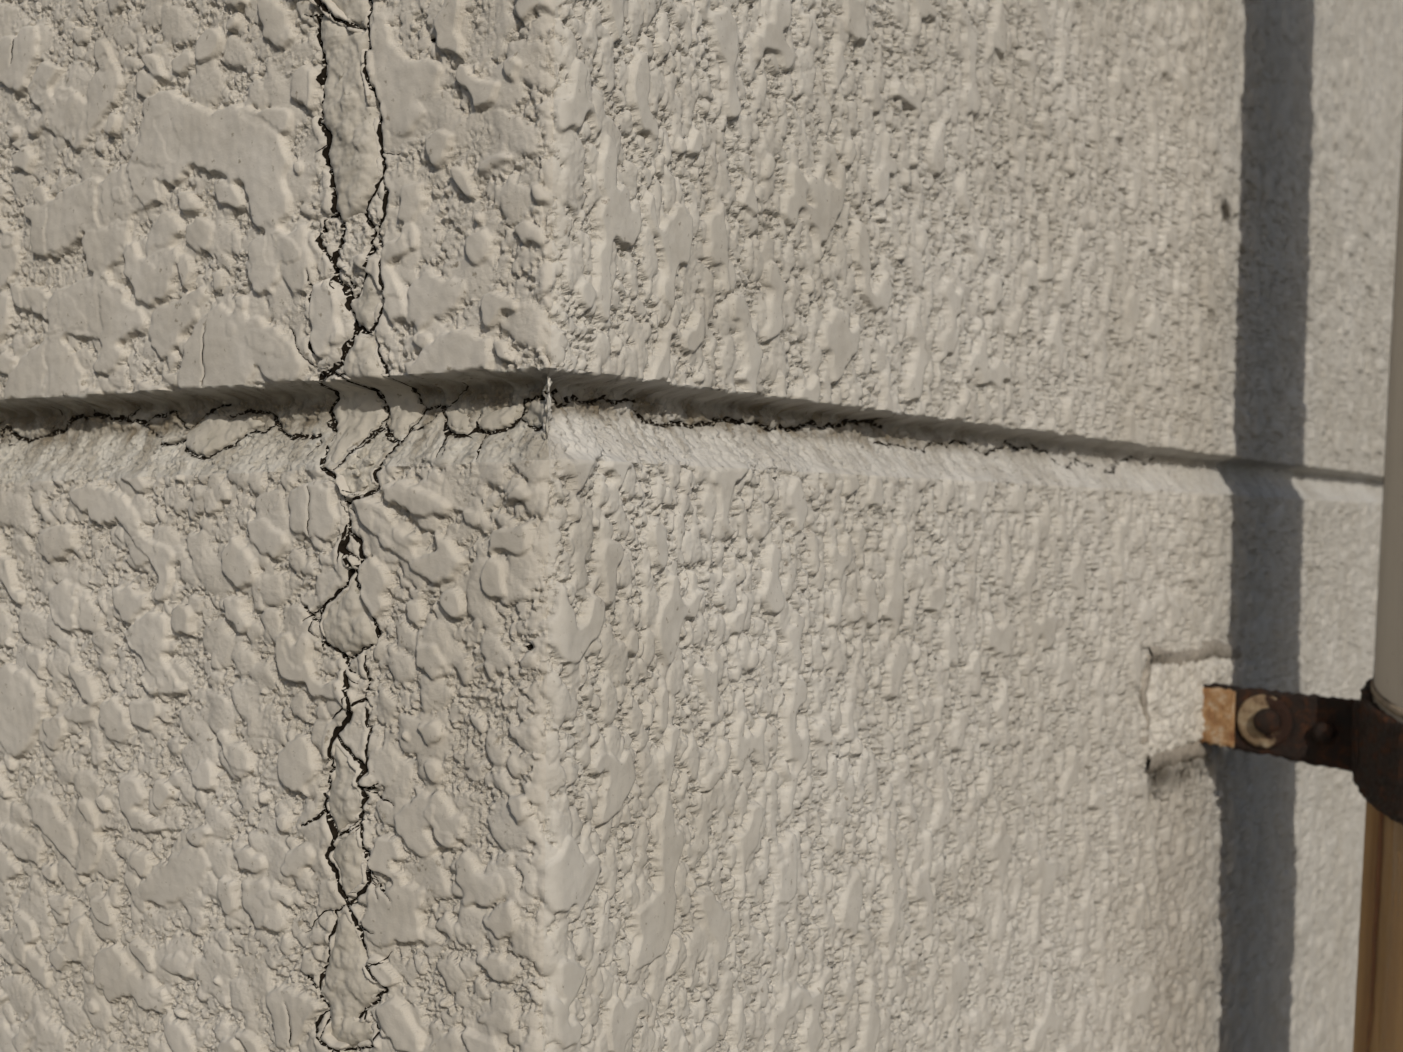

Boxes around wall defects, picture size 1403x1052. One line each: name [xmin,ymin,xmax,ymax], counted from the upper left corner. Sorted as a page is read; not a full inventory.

crack [0,0,883,1052]
crack [873,439,1163,474]